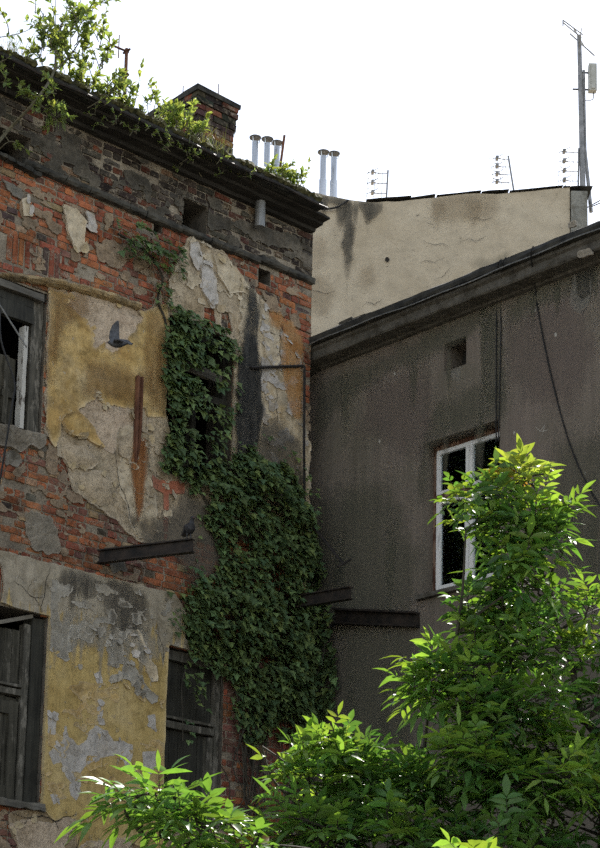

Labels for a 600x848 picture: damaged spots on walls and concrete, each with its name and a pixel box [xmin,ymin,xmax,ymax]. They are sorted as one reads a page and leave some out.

water stain [322,195,382,264]
flaking render [0,151,312,446]
water stain [233,283,300,501]
flaking render [79,389,185,532]
rust [131,438,147,516]
flaking render [0,443,186,704]
water stain [50,571,156,669]
peeling [47,699,157,800]
flaking render [0,805,76,848]
flaking render [79,837,132,848]